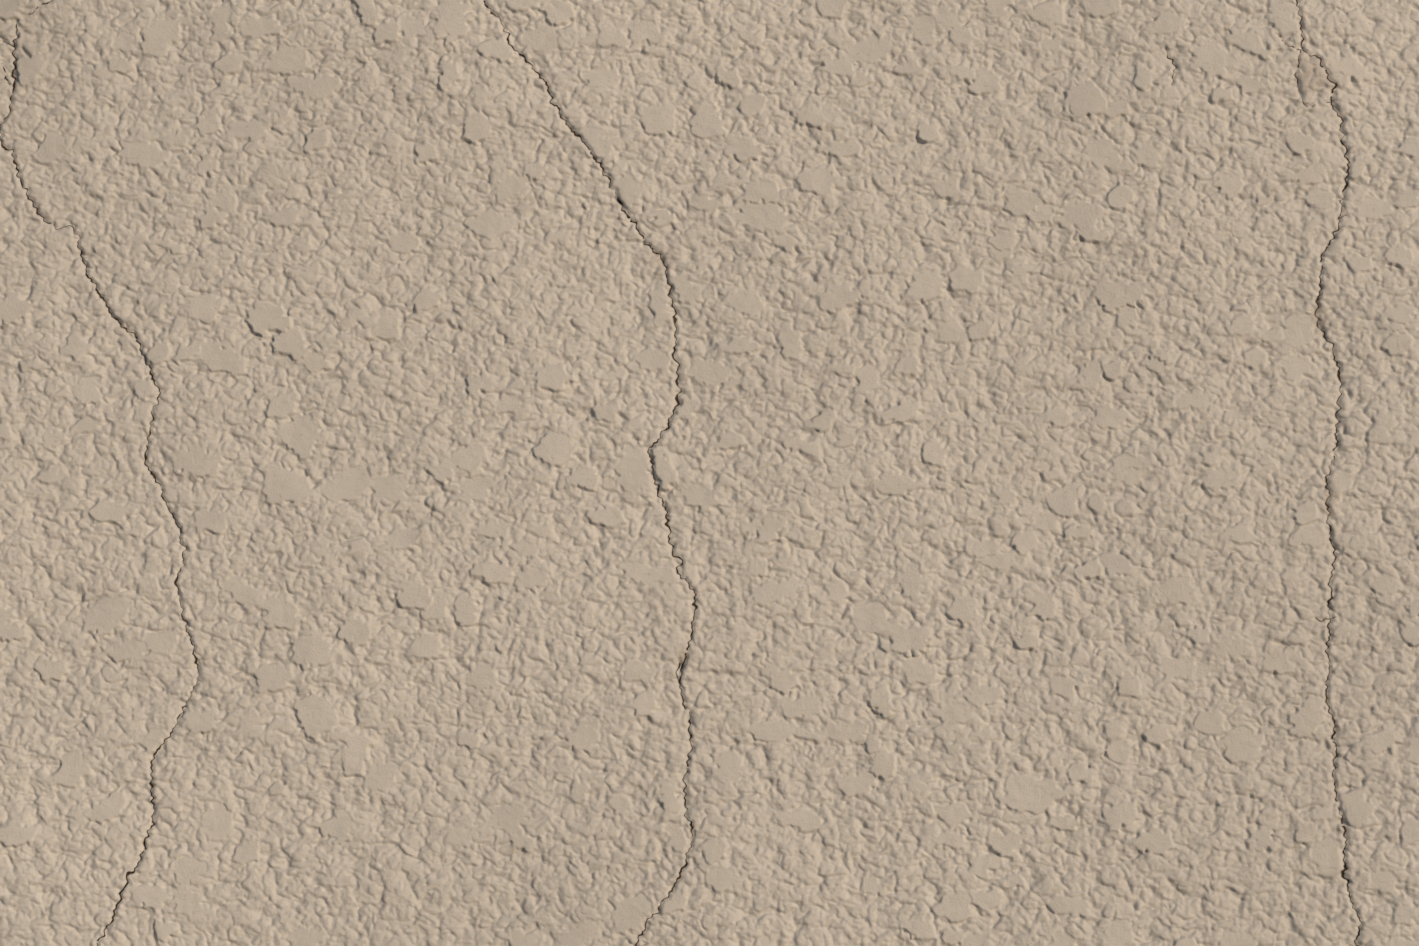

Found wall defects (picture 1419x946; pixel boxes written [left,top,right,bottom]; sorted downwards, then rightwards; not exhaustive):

crack [0,0,199,946]
crack [484,0,698,946]
crack [1280,0,1362,946]